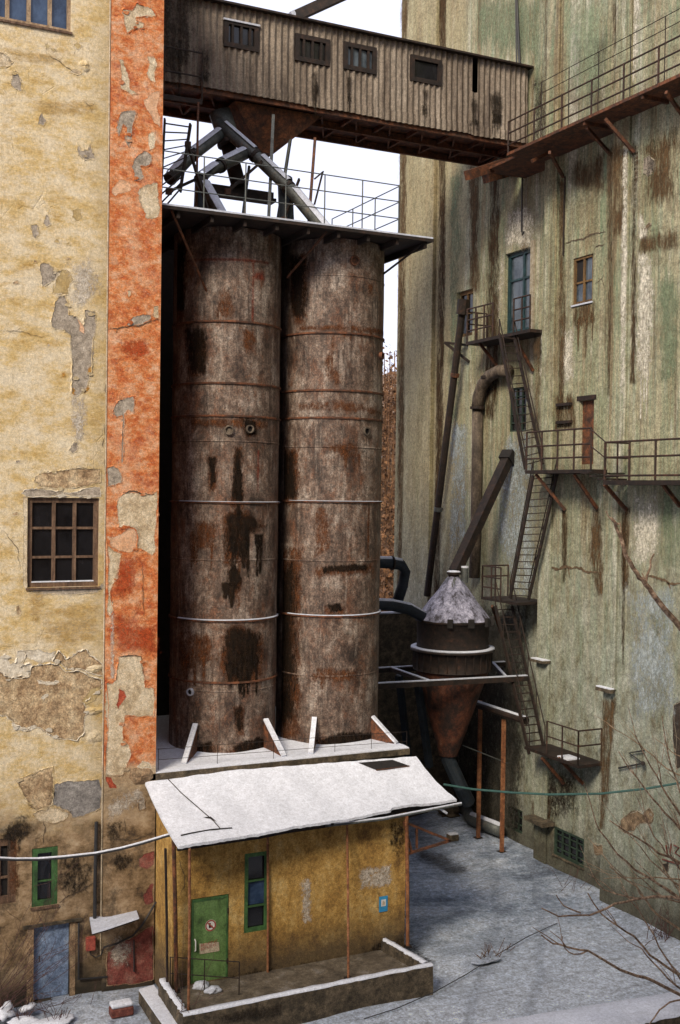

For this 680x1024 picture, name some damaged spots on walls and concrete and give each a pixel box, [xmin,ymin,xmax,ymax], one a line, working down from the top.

peeling [112,56,161,219]
flaking render [30,214,97,397]
leakage [433,161,534,593]
leakage [555,127,680,429]
peeling [12,395,159,617]
corrosion [190,494,262,606]
flaking render [0,649,156,824]